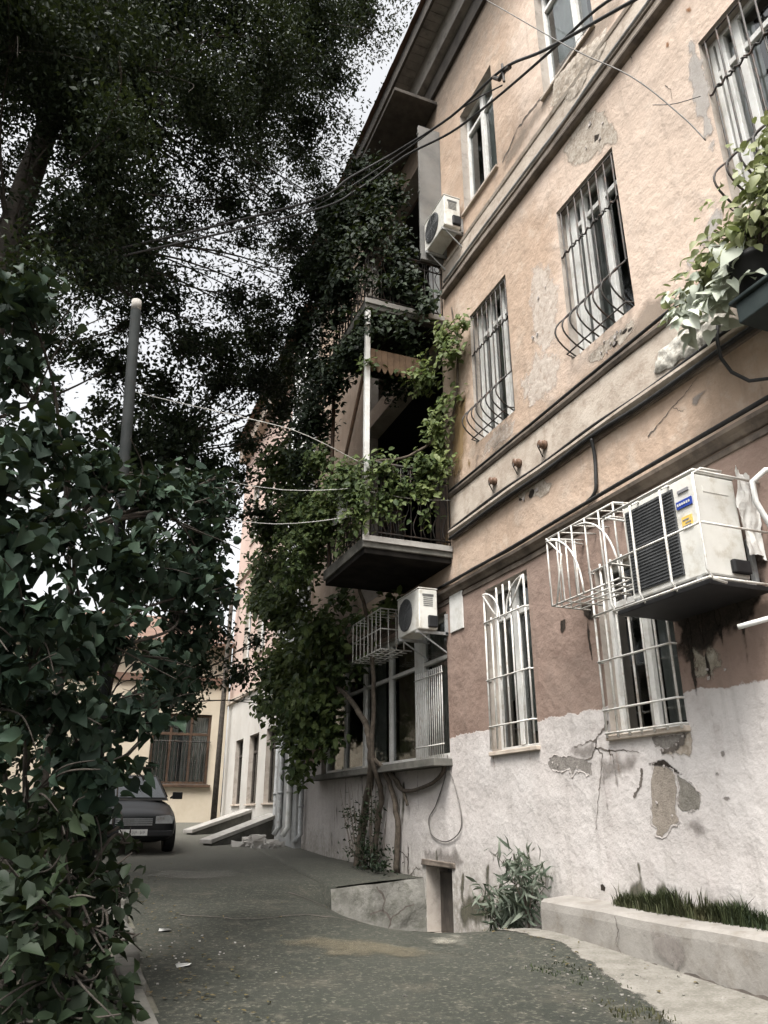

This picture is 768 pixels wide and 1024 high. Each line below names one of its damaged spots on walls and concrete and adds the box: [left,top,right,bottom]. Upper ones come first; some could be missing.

peeling [688,40,713,137]
flaking render [564,109,618,166]
crack [648,383,693,437]
water stain [677,543,767,689]
flaking render [548,746,593,779]
crack [575,721,639,828]
flaking render [633,732,702,840]